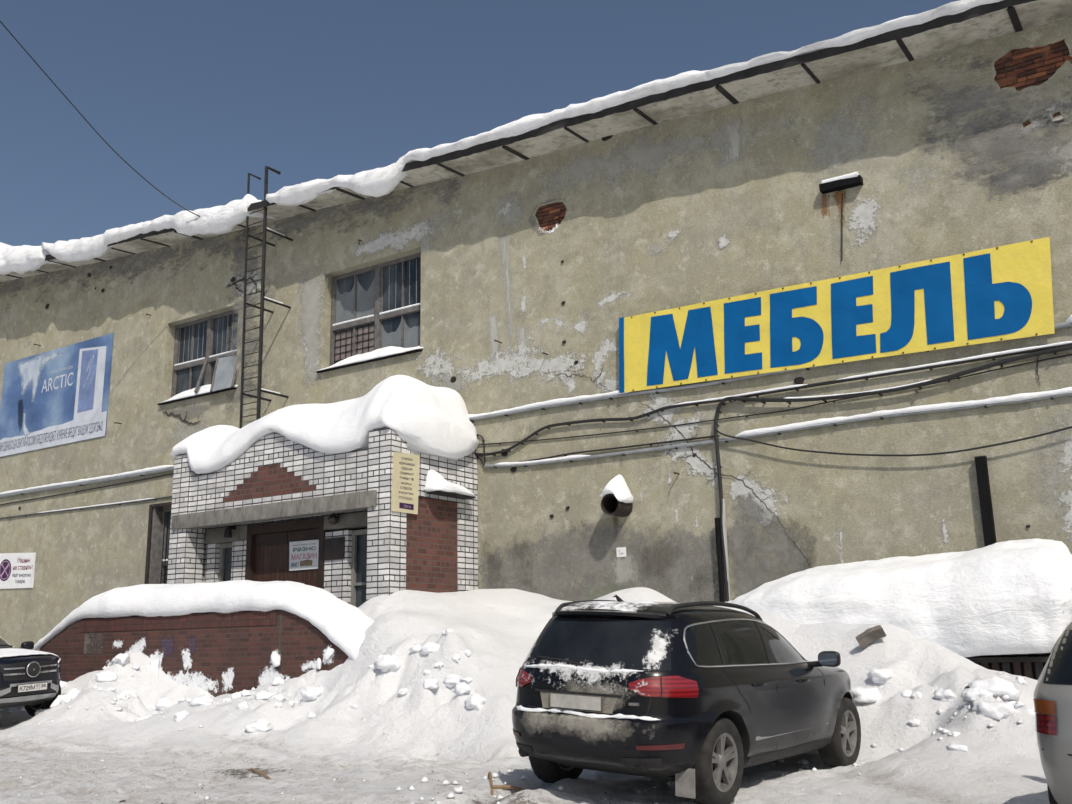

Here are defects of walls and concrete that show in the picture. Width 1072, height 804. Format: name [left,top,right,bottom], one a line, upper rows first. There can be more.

spalling [994,39,1072,91]
spalling [1008,101,1072,140]
peeling [355,212,456,258]
spalling [529,199,567,235]
rust [822,189,845,221]
peeling [843,190,883,247]
peeling [416,291,633,394]
crack [559,368,811,568]
peeling [1041,416,1072,542]